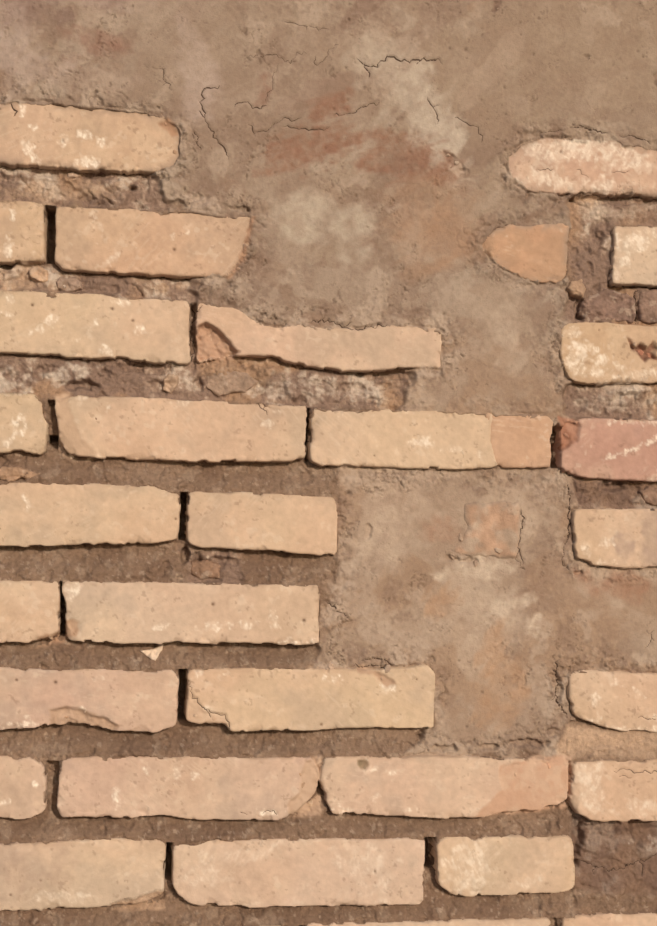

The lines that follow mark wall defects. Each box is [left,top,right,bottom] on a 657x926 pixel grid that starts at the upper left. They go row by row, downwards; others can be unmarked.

crack [235,22,377,134]
crack [358,56,440,77]
crack [192,85,229,159]
crack [427,99,483,141]
spalling [194,319,241,366]
spalling [625,334,657,365]
spalling [53,390,100,463]
peeling [141,644,163,661]
spalling [46,703,125,731]
spalling [183,683,232,731]
crack [189,684,230,727]
spalling [285,754,326,820]